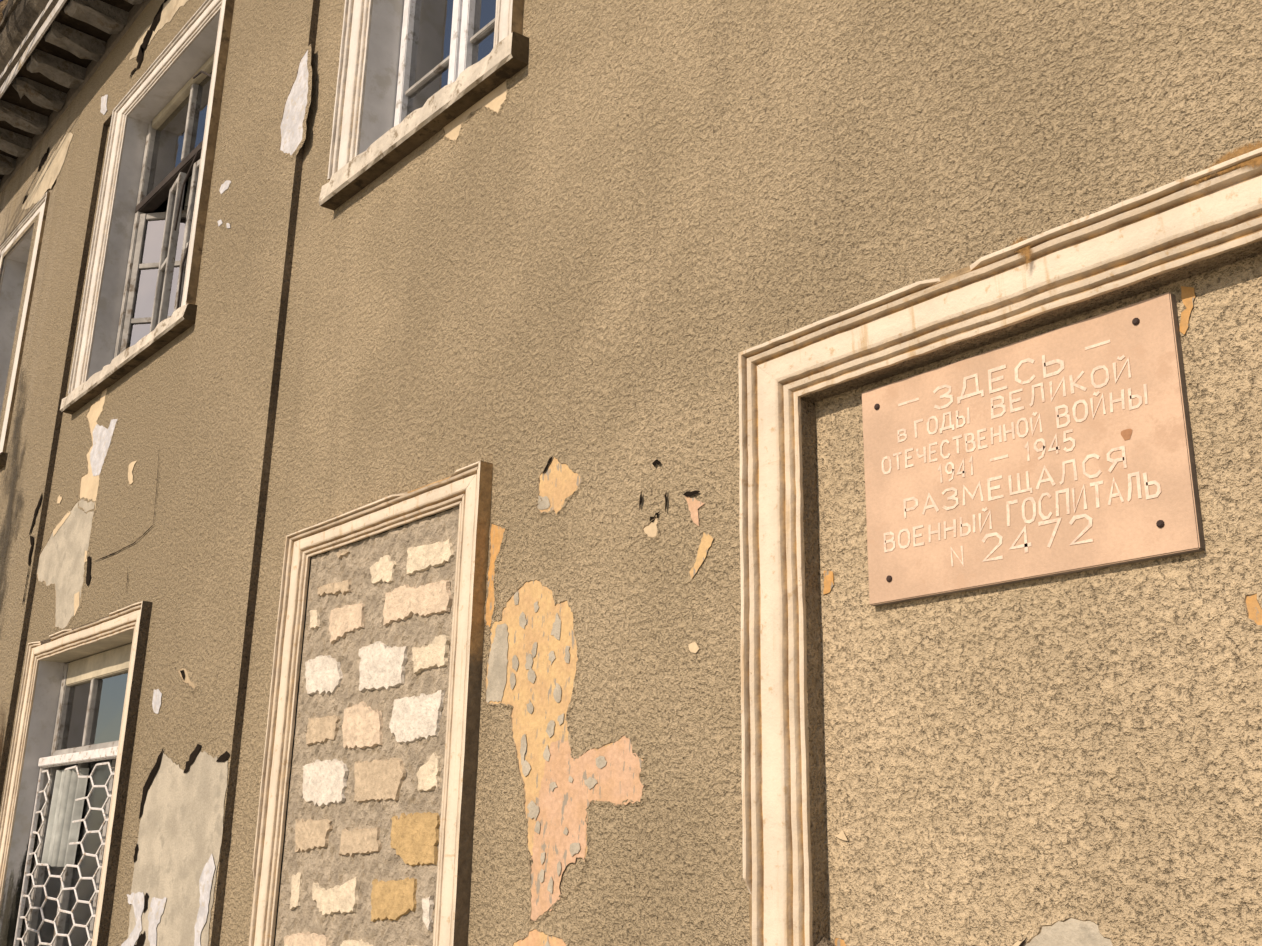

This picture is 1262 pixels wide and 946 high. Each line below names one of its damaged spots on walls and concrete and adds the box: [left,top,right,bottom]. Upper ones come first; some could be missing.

peeling [278,44,312,161]
peeling [442,79,510,144]
water stain [0,374,25,608]
crack [22,493,42,605]
peeling [78,387,120,514]
peeling [536,452,585,519]
peeling [641,512,662,542]
peeling [685,496,713,578]
peeling [484,520,648,946]
peeling [121,892,166,946]
peeling [194,854,215,946]